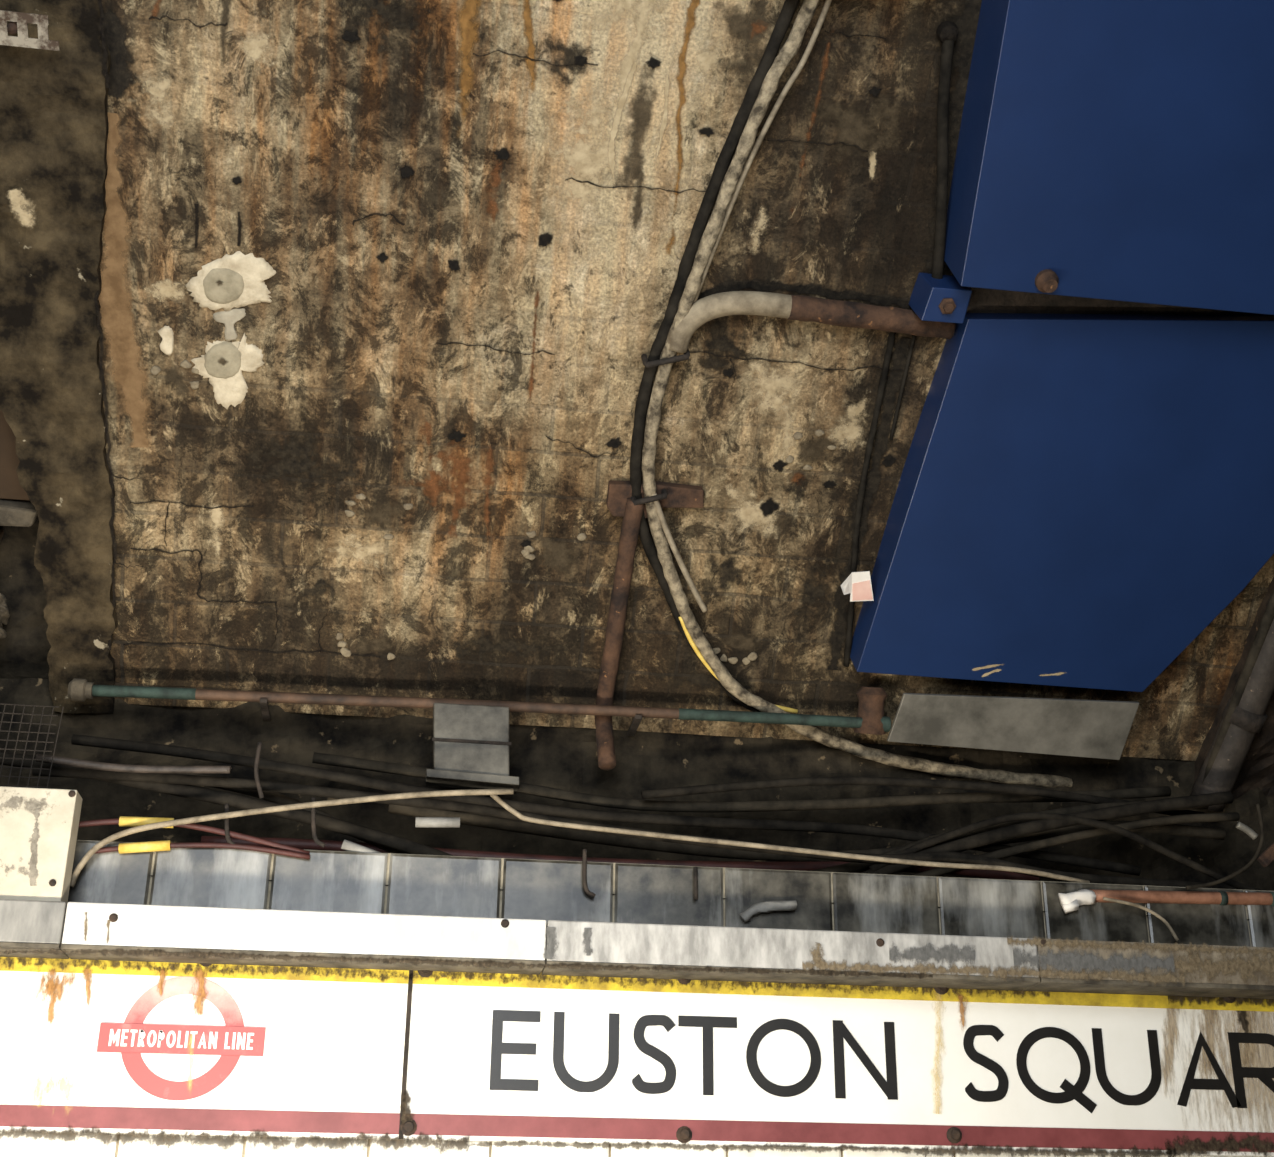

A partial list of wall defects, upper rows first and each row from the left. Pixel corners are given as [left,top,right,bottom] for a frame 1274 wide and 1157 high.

rust [523,0,536,90]
water stain [543,0,670,228]
rust [674,0,700,203]
crack [565,177,706,194]
water stain [694,320,797,462]
efflorescence [830,399,865,446]
water stain [209,506,223,555]
water stain [727,486,781,538]
water stain [707,553,758,598]
rust [38,969,92,1024]
rust [158,970,166,995]
rust [193,969,207,1015]